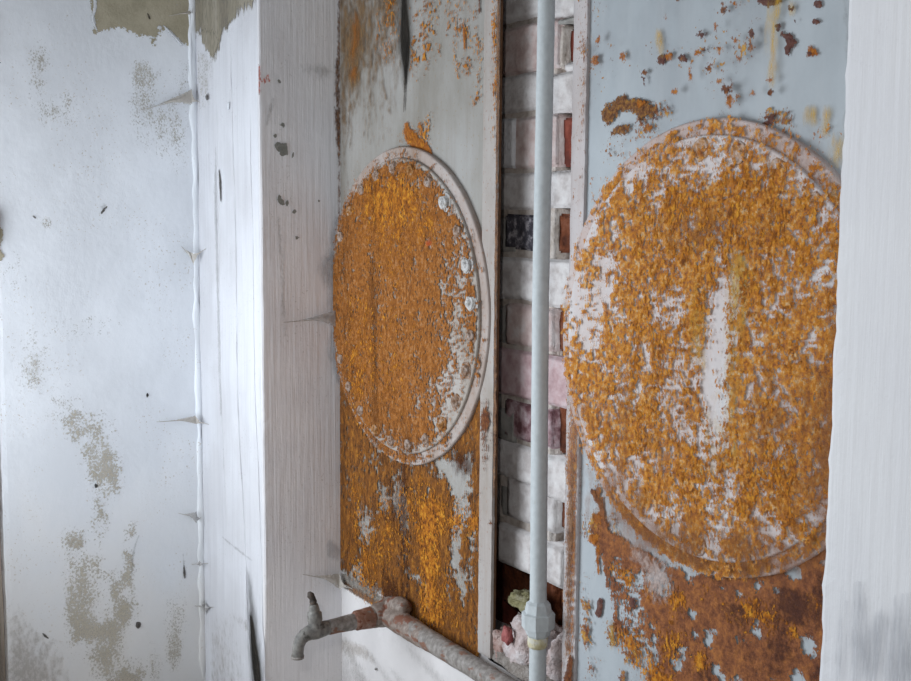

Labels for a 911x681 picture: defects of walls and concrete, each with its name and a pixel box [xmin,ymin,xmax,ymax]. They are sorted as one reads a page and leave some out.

peeling [89,0,253,59]
corrosion [333,0,500,658]
corrosion [560,0,841,681]